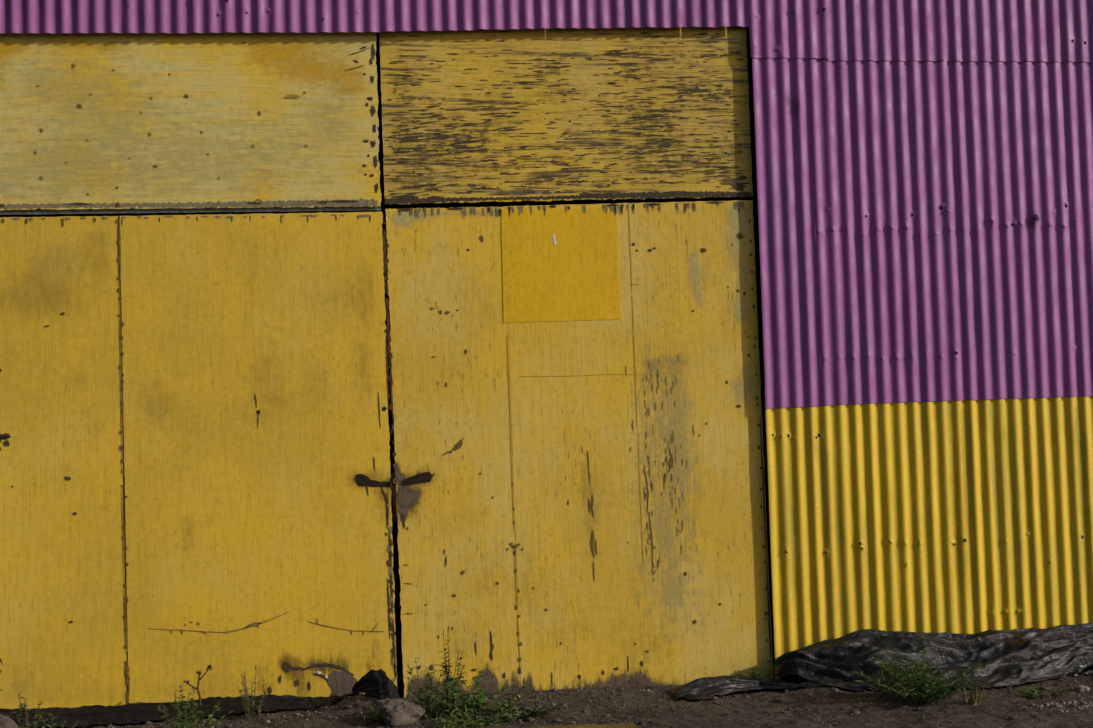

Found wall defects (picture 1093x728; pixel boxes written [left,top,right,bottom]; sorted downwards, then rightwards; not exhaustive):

peeling [0,31,751,469]
peeling [632,359,687,581]